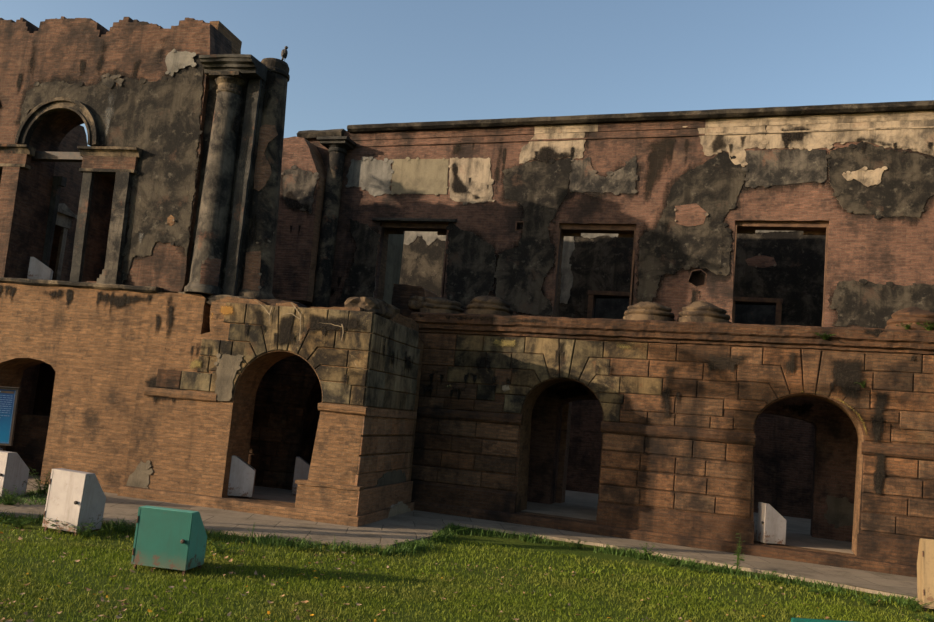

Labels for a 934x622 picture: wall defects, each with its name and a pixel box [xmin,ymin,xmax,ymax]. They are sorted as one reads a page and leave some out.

flaking render [16,49,204,285]
damp [96,292,152,310]
damp [244,308,294,345]
flaking render [254,124,319,216]
flaking render [337,218,381,303]
flaking render [345,129,641,317]
damp [532,147,575,163]
damp [712,135,746,153]
flaking render [636,120,934,303]
damp [781,127,809,150]
flaking render [828,279,934,329]
damp [830,359,887,494]